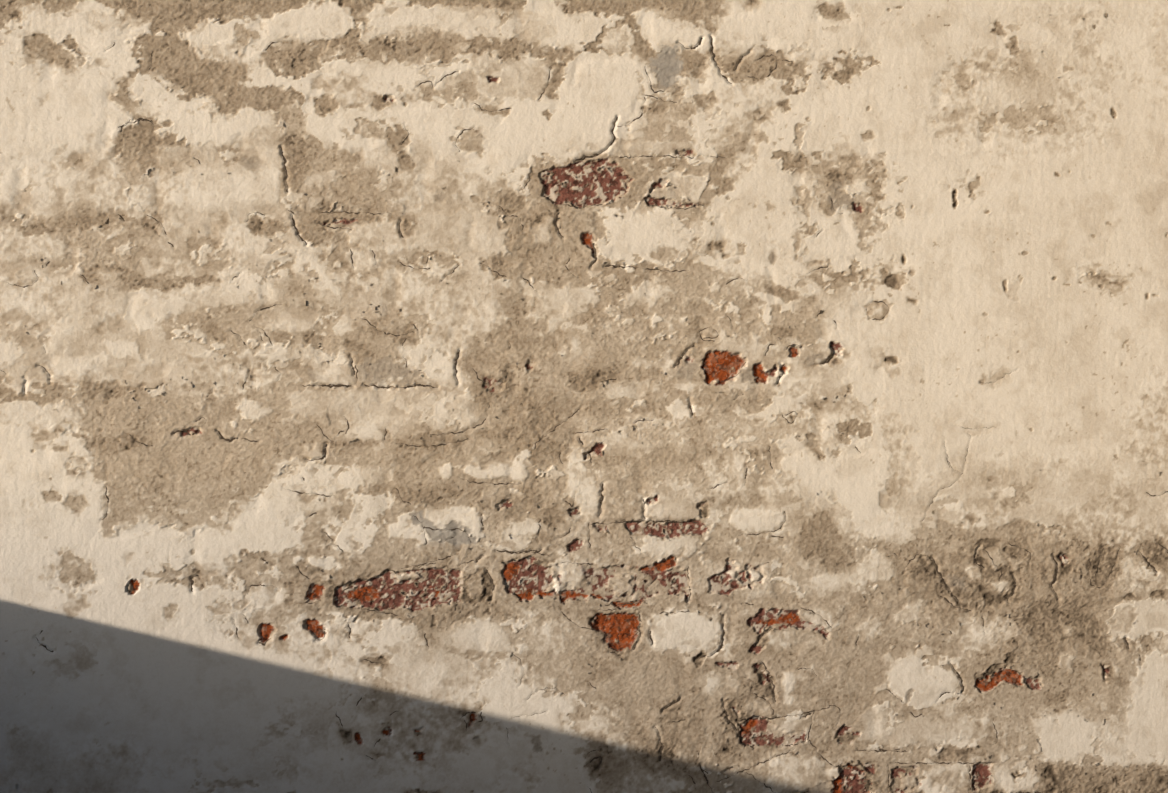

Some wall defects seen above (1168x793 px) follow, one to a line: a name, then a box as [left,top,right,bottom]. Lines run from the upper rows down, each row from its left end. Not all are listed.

peeling [260,0,582,118]
peeling [555,0,813,197]
peeling [814,0,865,33]
peeling [818,51,881,85]
spalling [861,130,876,143]
peeling [0,0,515,451]
peeling [21,486,90,517]
flaking render [37,141,1168,793]